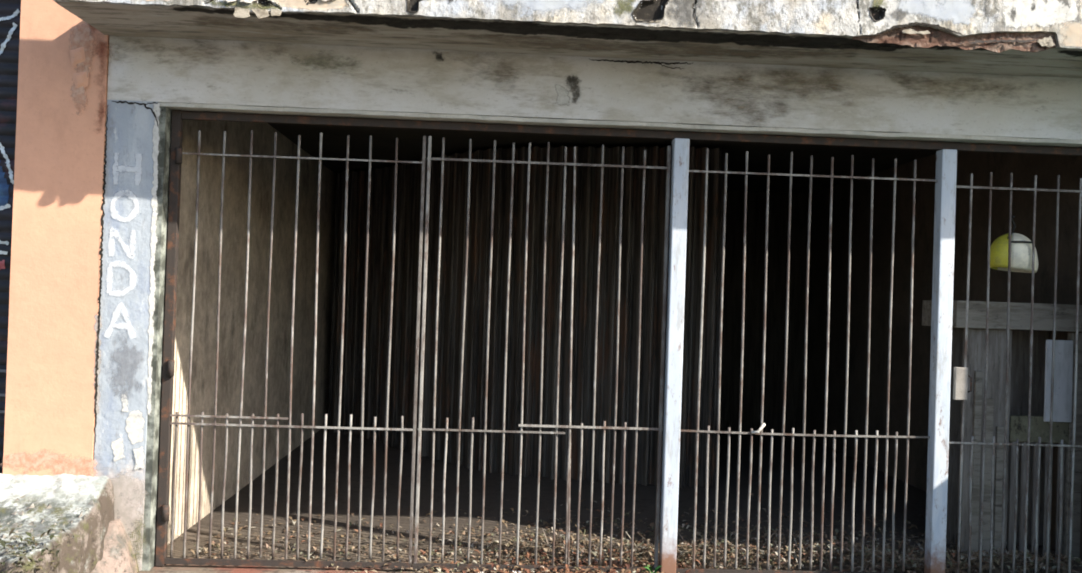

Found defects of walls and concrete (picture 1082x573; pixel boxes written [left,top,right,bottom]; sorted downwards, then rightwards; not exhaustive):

crack [205,0,277,8]
spalling [209,0,348,19]
damp [171,0,913,58]
hole [632,0,669,23]
spalling [852,0,1082,53]
damp [700,71,840,119]
peeling [110,103,161,554]